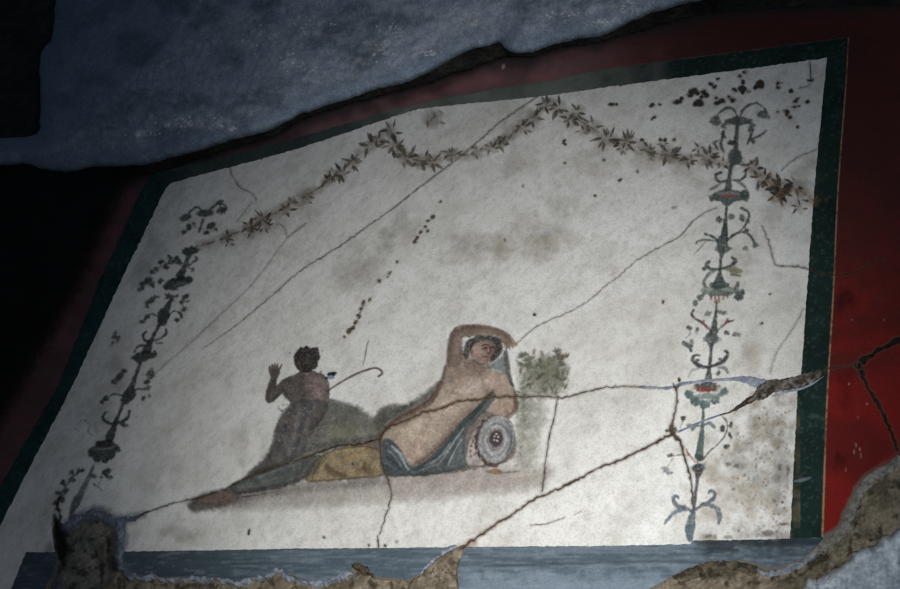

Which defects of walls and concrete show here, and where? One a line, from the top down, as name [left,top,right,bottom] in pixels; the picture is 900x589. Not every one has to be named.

peeling [673,71,764,107]
peeling [776,82,809,129]
crack [210,97,537,344]
crack [136,336,900,549]
flaking render [50,507,465,589]
flaking render [658,455,900,589]